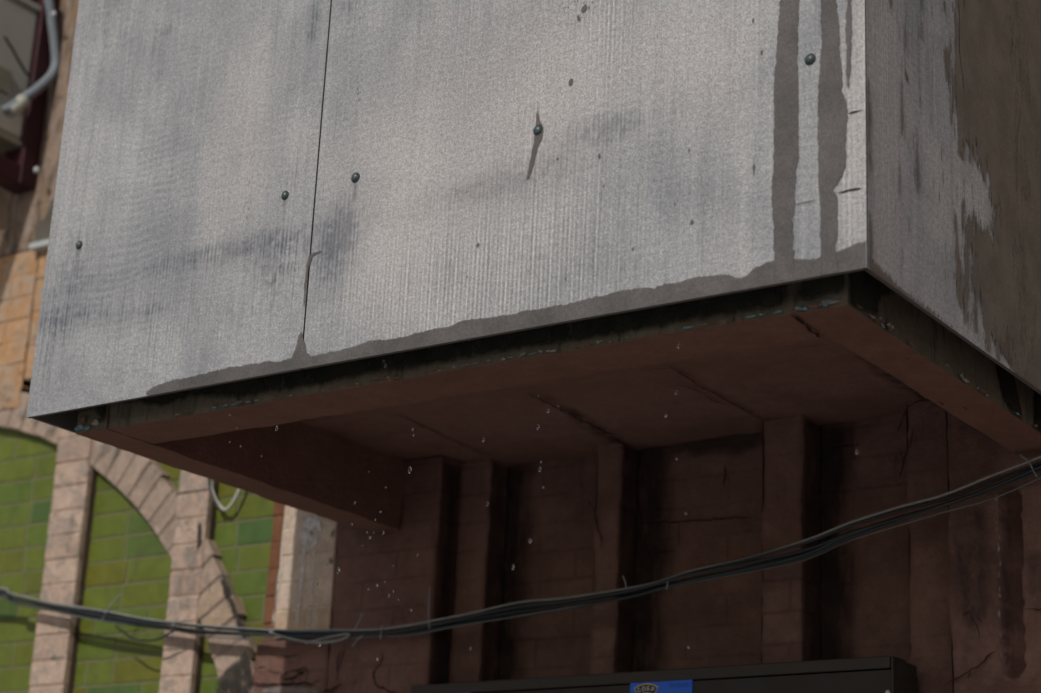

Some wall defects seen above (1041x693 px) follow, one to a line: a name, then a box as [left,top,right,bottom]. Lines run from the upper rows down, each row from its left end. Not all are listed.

leakage [125,0,953,405]
leakage [645,433,760,455]
crack [791,315,821,338]
leakage [944,0,1041,431]